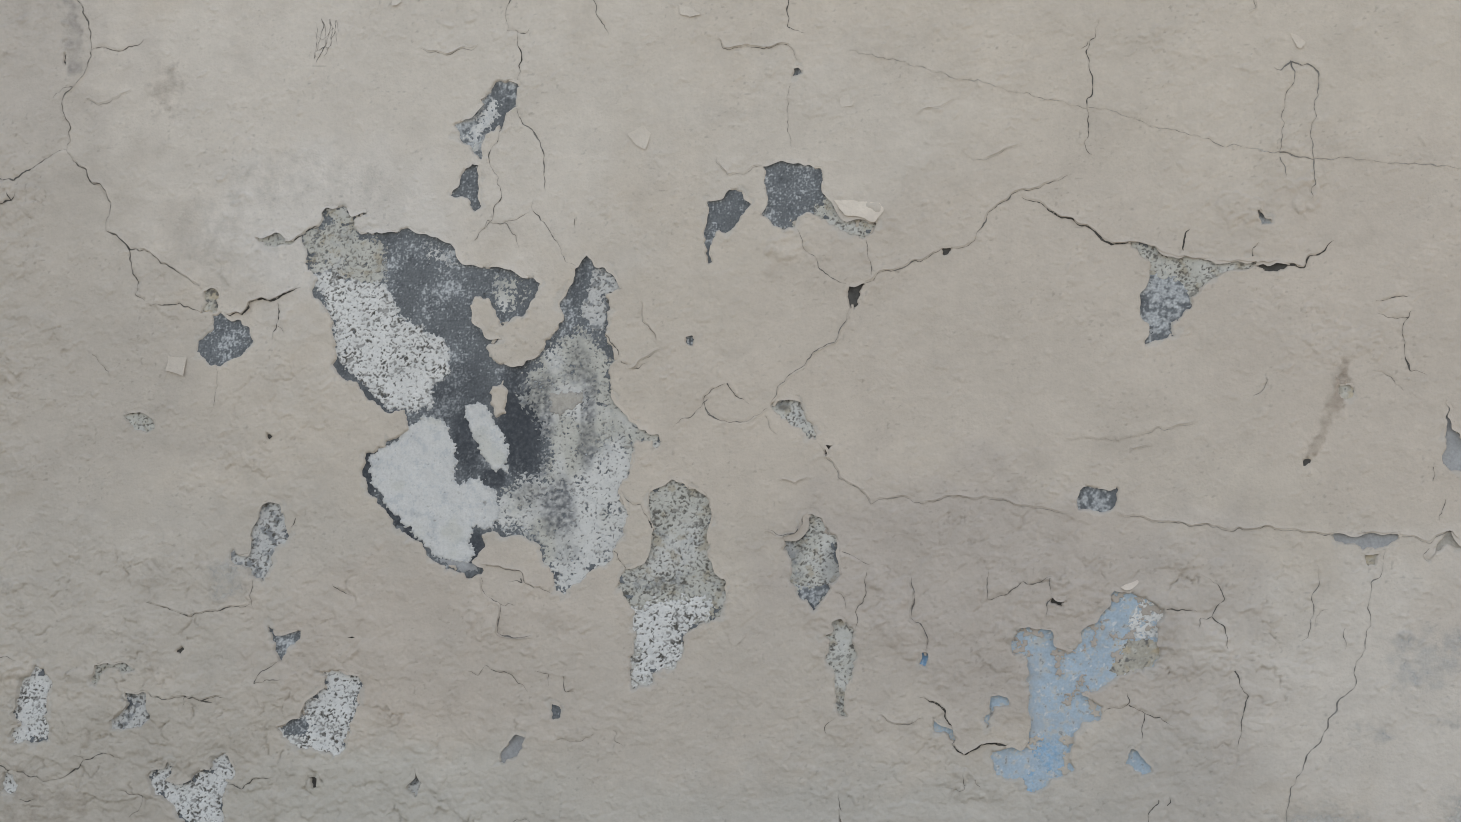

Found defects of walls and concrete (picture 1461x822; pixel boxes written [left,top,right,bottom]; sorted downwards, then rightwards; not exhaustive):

crack [0,0,202,311]
crack [285,226,316,241]
peeling [449,78,521,211]
peeling [703,156,884,263]
crack [676,34,1458,428]
spalling [1128,238,1290,344]
peeling [166,204,729,689]
spalling [764,508,857,716]
spalling [7,666,52,744]
spalling [275,669,363,756]
peeling [919,580,1163,792]
spalling [146,752,236,822]